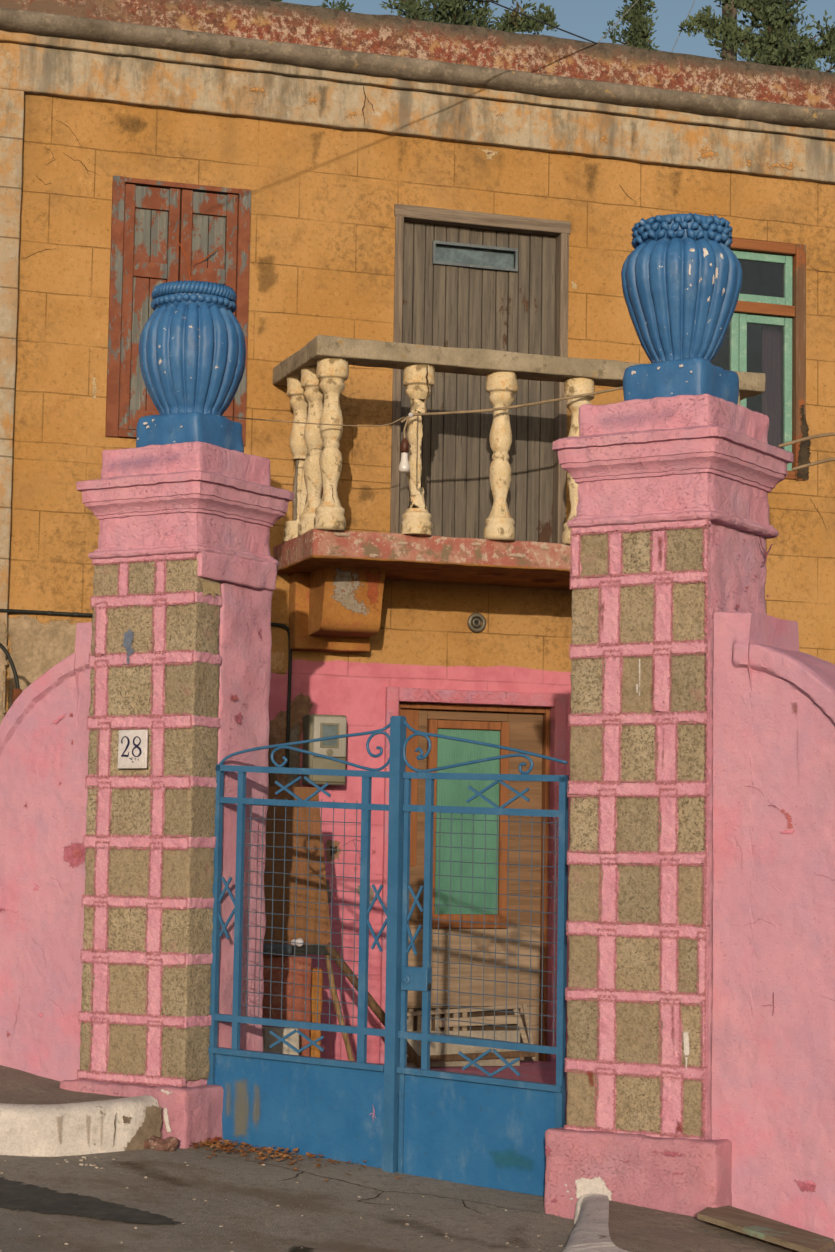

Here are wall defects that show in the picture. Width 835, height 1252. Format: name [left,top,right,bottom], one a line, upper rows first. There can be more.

peeling [331,554,382,615]
crack [196,1151,539,1213]